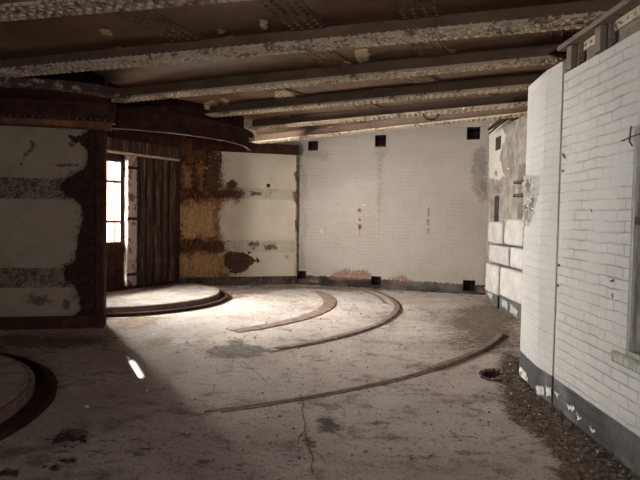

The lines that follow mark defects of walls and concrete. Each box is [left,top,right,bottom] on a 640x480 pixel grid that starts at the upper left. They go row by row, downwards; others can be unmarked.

peeling [342,48,371,66]
peeling [205,152,238,189]
peeling [522,174,540,227]
peeling [222,248,259,274]
peeling [536,385,559,399]
crack [297,395,325,476]